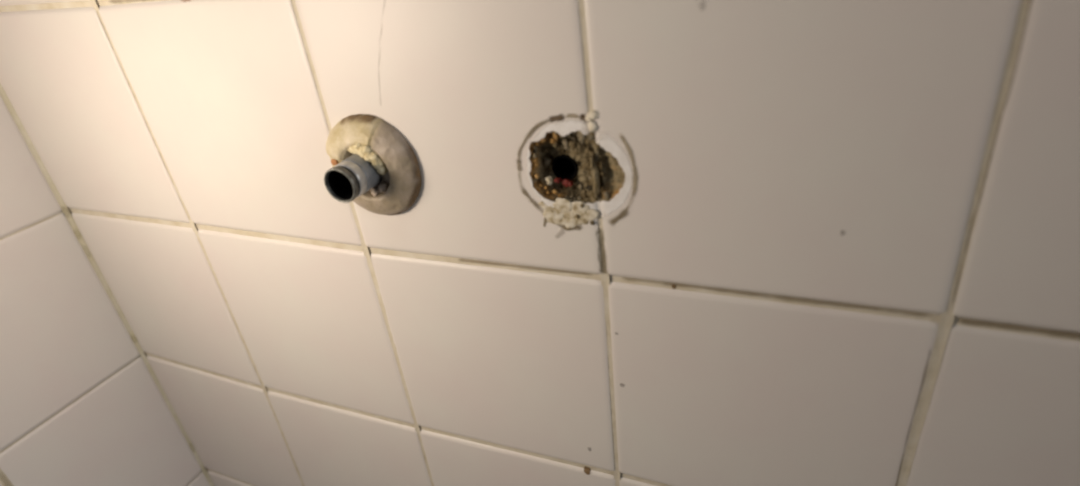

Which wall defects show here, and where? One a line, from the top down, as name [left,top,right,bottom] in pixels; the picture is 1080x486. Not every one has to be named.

spalling [529,131,625,231]